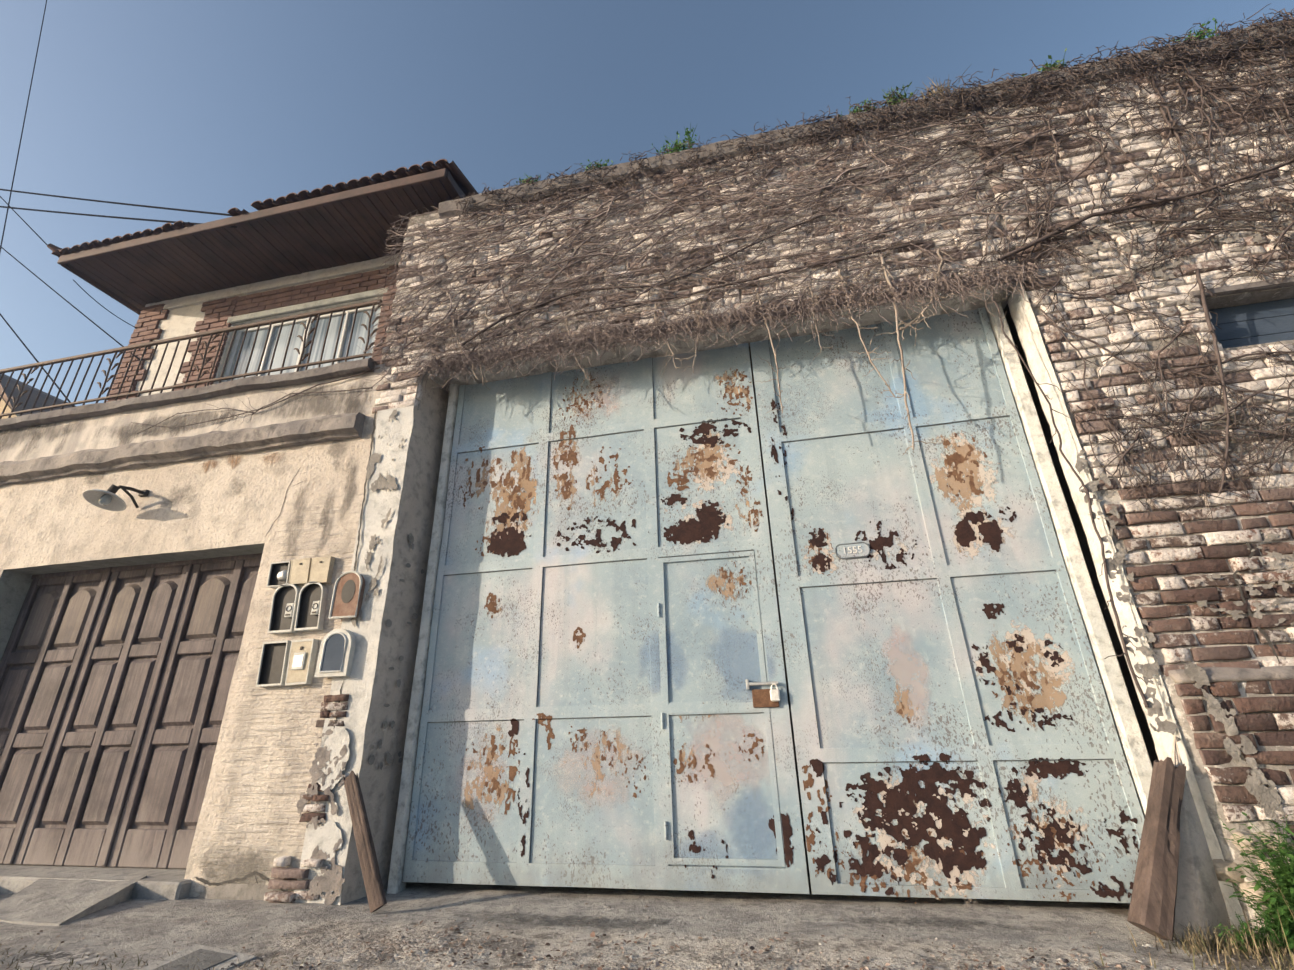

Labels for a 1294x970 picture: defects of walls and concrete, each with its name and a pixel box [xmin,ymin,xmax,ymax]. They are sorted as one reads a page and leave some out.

rust [459,446,537,557]
rust [553,373,633,511]
rust [661,369,764,545]
rust [802,526,837,576]
rust [855,521,917,570]
rust [929,430,1017,559]
rust [971,603,1075,732]
flaking render [196,694,350,905]
rust [464,718,520,818]
rust [565,726,648,798]
rust [802,753,1101,904]